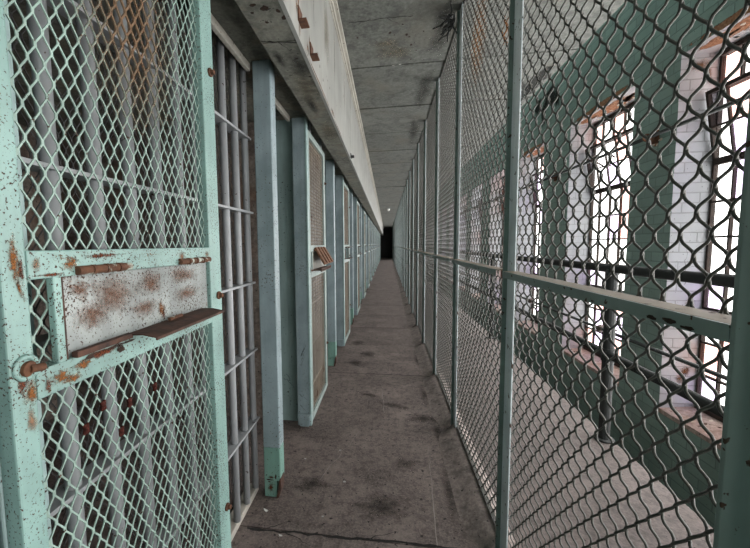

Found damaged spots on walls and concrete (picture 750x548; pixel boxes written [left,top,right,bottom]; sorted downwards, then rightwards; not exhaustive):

rust [9,241,25,301]
rust [35,254,79,277]
rust [98,282,129,305]
rust [85,308,100,323]
rust [137,301,165,319]
rust [18,381,37,402]
crack [247,522,452,548]